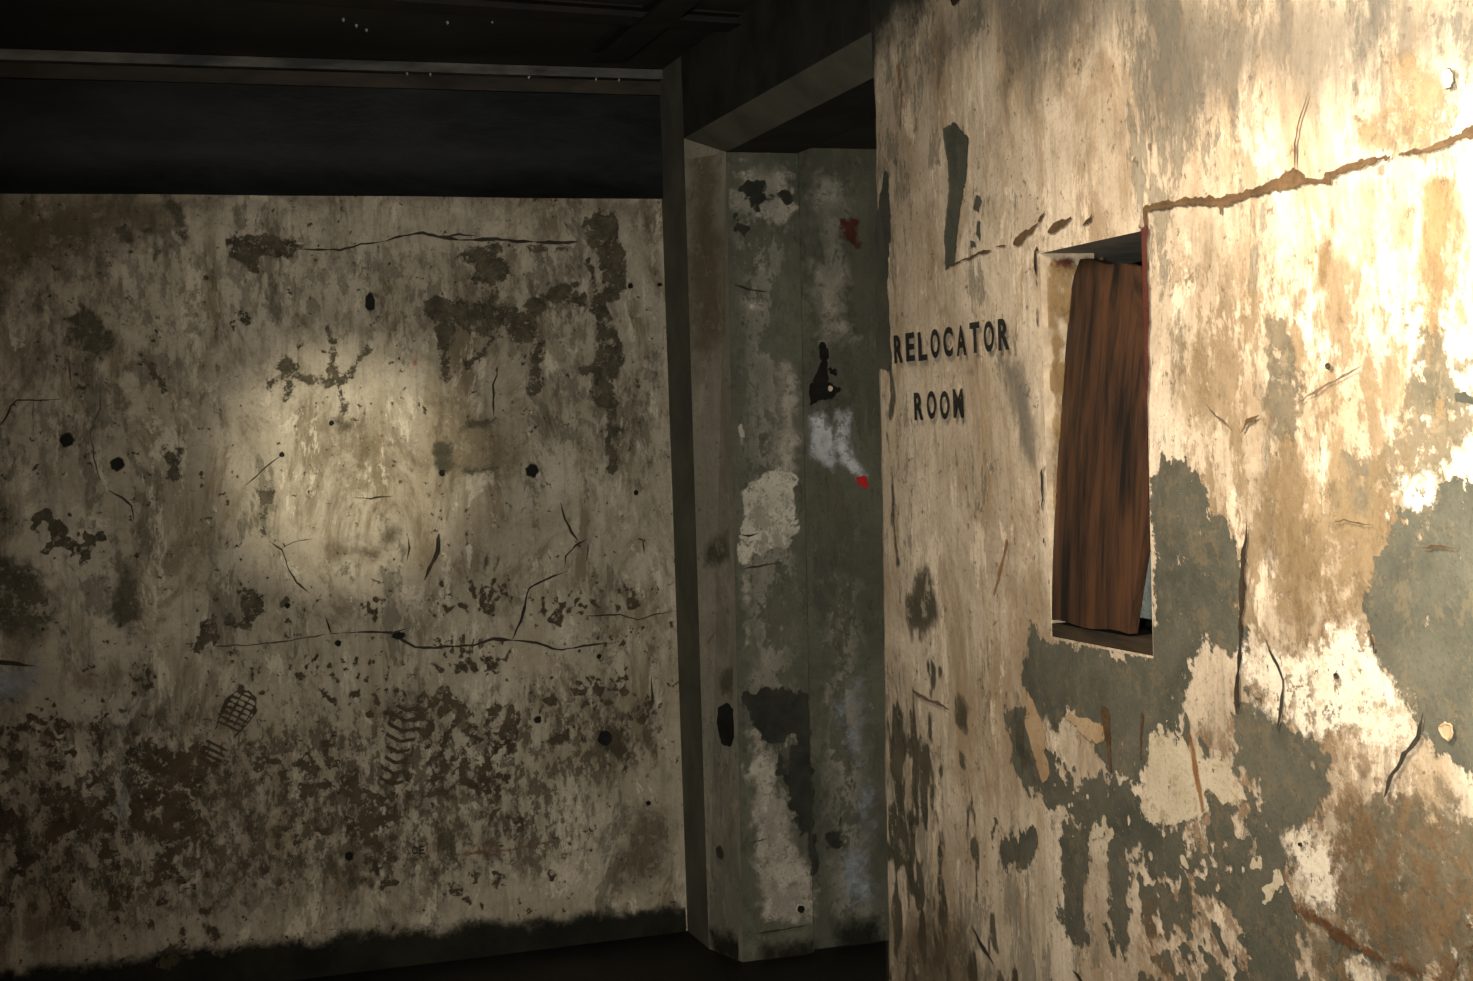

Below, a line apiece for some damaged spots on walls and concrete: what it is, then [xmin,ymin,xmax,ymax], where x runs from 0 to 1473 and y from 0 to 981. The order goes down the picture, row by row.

crack [1143,94,1473,226]
crack [299,231,577,251]
crack [947,212,1092,267]
peeling [1454,391,1473,404]
damp [432,442,492,474]
crack [214,502,672,651]
peeling [1361,471,1473,785]
peeling [1003,450,1332,981]
crack [1384,712,1423,797]
peeling [887,660,965,981]
peeling [967,796,1039,901]
peeling [988,913,998,953]